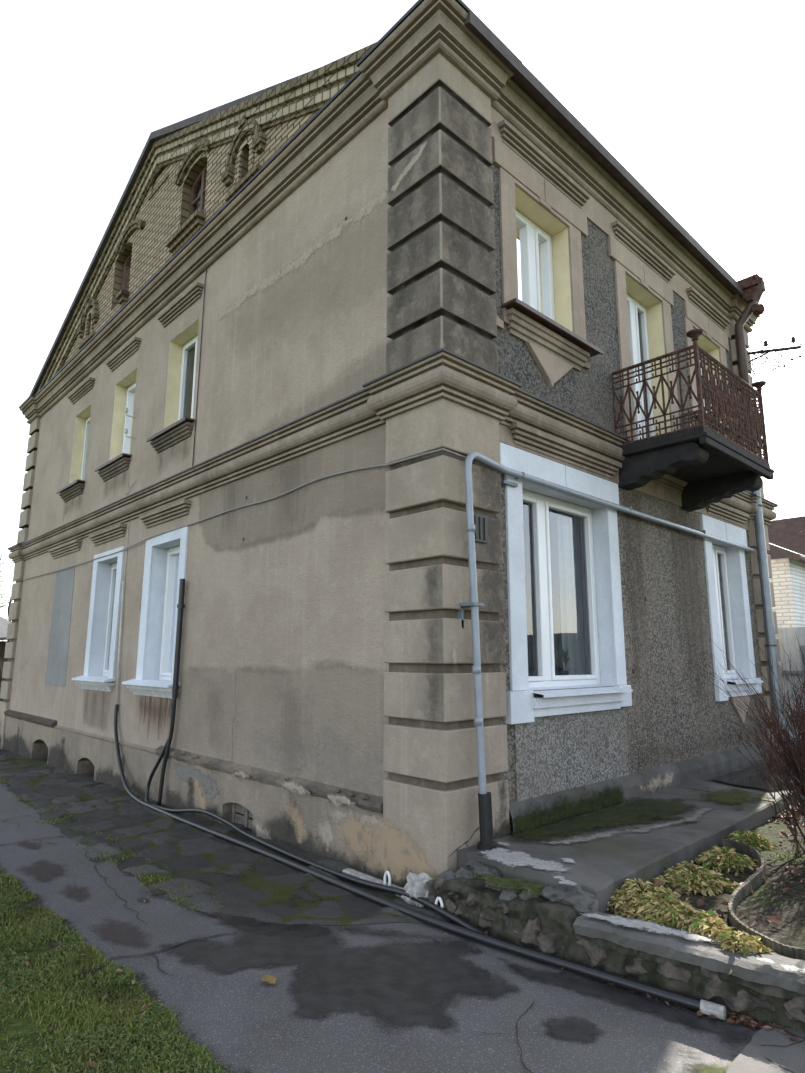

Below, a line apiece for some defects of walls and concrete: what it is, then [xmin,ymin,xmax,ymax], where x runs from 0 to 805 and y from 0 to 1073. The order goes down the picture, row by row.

flaking render [256,820,269,839]
flaking render [280,783,310,794]
flaking render [287,807,307,842]
flaking render [319,795,435,881]
crack [110,932,236,976]
damp [160,911,519,1029]
crack [474,1001,534,1073]
damp [508,964,751,1046]